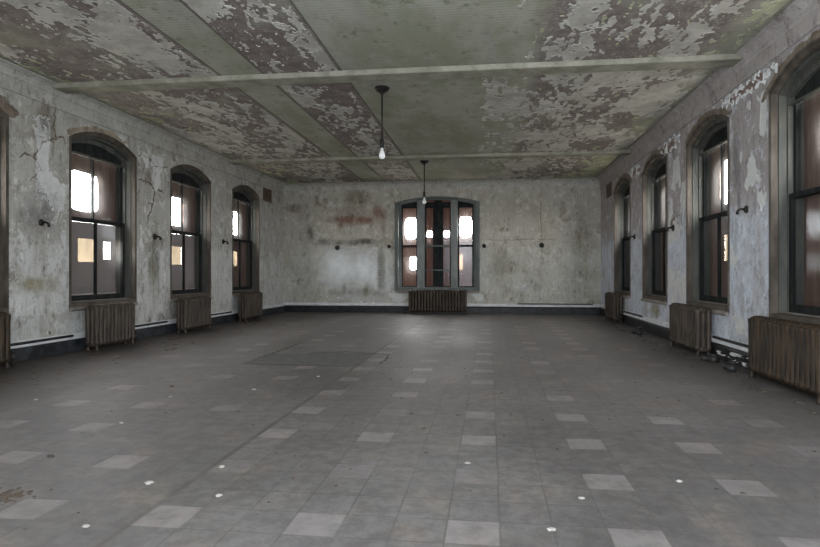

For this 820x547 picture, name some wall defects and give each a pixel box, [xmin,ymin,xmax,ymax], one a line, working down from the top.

peeling [0,0,217,82]
peeling [183,0,338,74]
peeling [513,0,790,63]
spalling [0,95,19,118]
peeling [87,88,359,183]
peeling [279,84,419,181]
peeling [476,68,714,179]